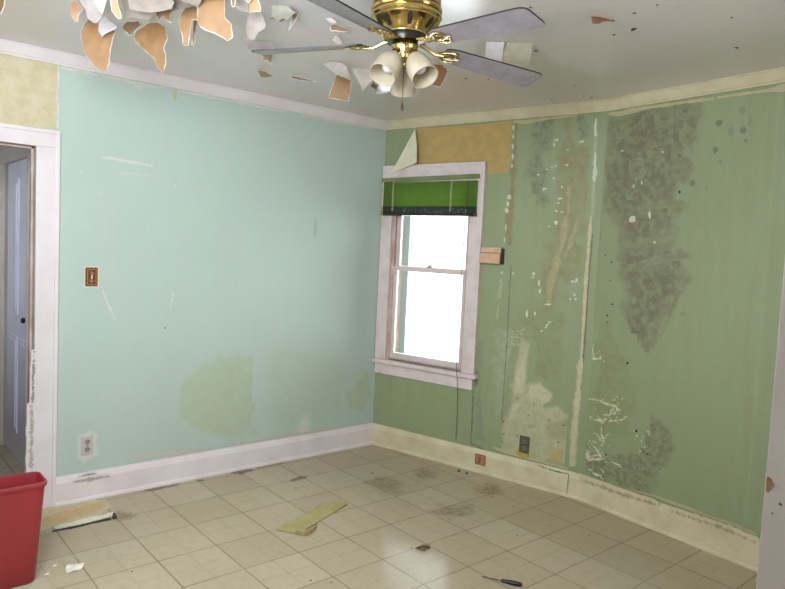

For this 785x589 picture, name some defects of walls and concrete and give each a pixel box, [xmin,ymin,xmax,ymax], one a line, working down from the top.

peeling [70,0,299,78]
peeling [326,18,350,45]
peeling [0,53,58,130]
peeling [323,62,390,101]
peeling [416,114,577,175]
leakage [509,96,754,390]
flaking render [495,329,569,461]
leakage [579,386,682,509]
leakage [669,506,760,548]